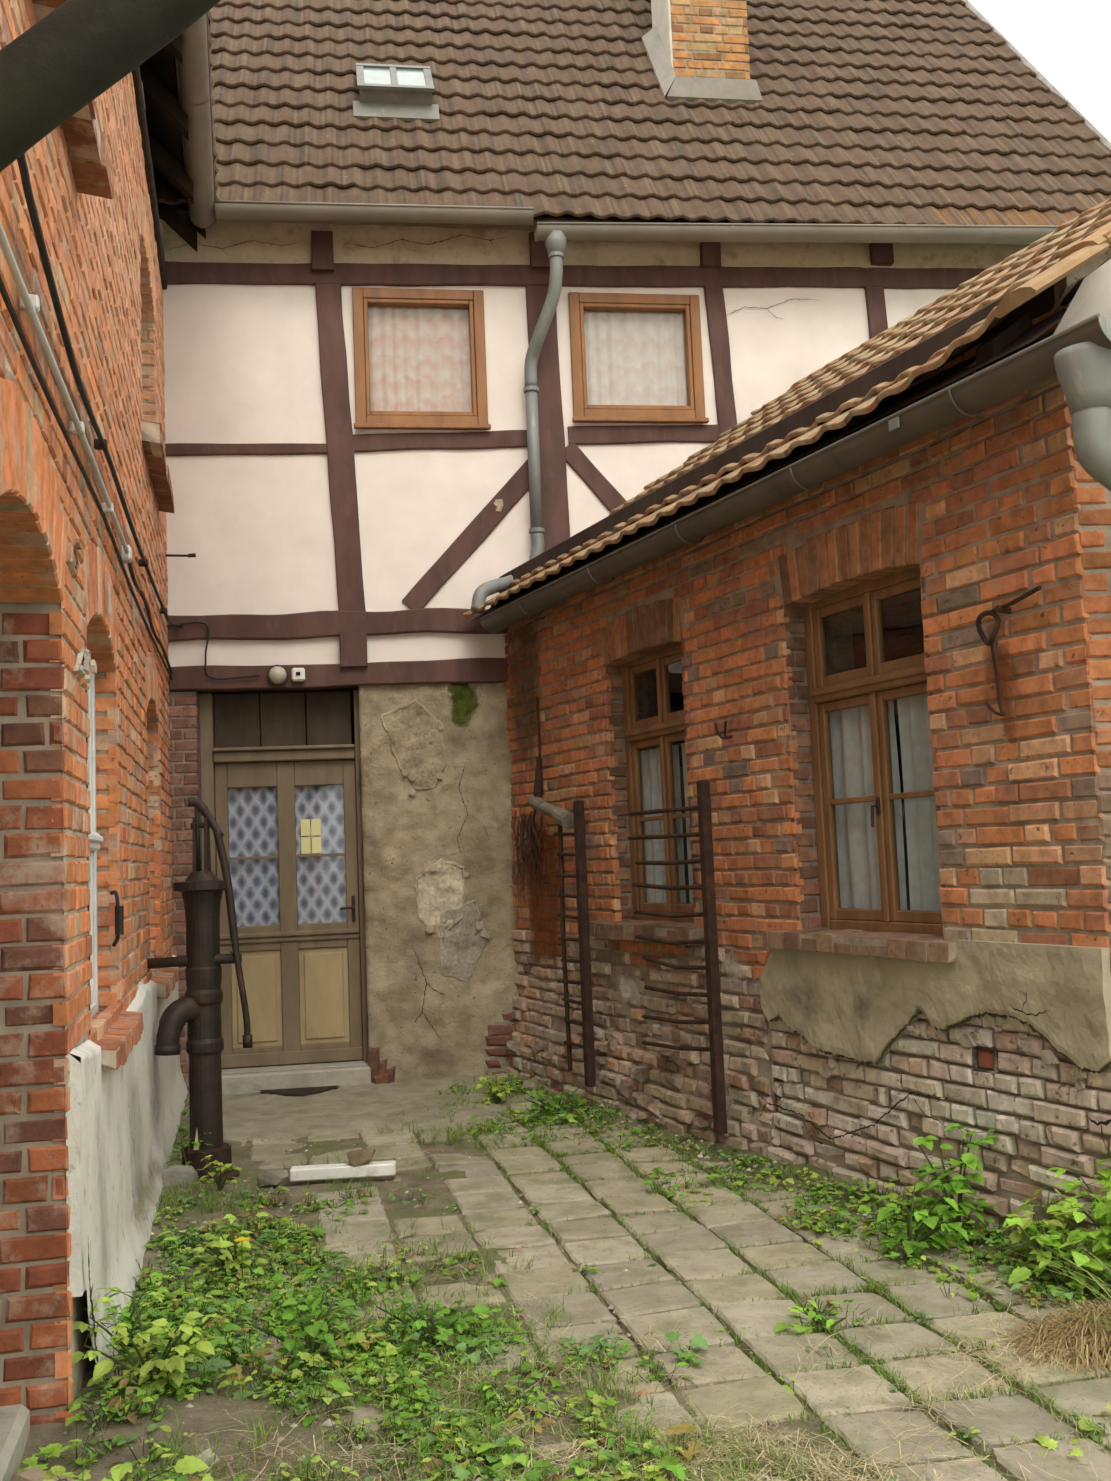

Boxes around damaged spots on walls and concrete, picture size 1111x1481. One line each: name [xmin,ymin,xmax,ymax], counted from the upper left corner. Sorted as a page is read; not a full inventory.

crack [727,298,815,319]
spalling [767,1009,1111,1259]